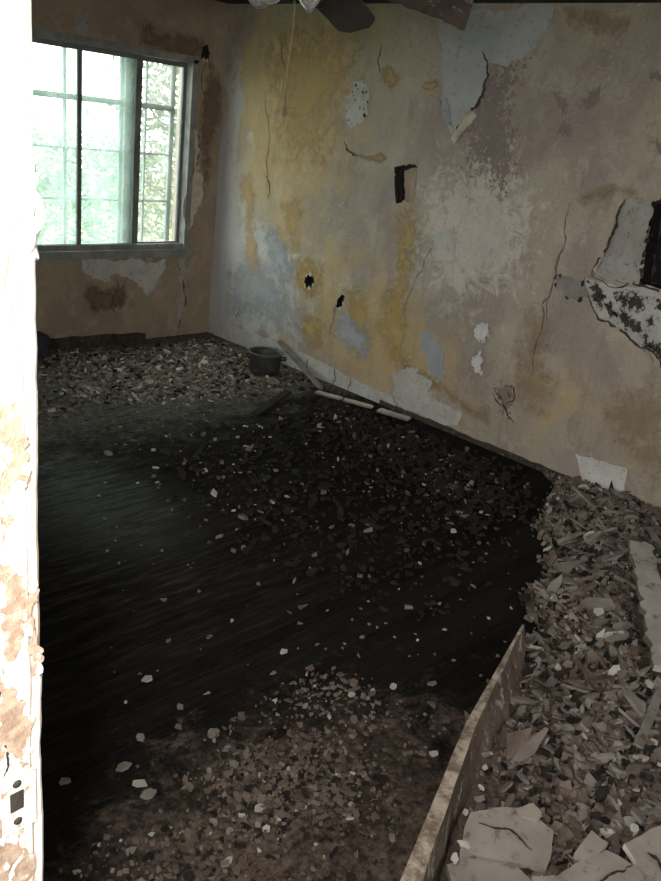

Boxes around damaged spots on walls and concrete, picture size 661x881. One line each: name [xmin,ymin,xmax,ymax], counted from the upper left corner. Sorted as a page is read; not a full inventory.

leakage [201,64,221,181]
peeling [344,79,370,128]
peeling [438,3,554,202]
flaking render [82,258,166,296]
flaking render [210,322,462,426]
spalling [471,322,490,375]
crack [492,203,570,423]
flaking render [554,195,661,368]
flaking render [549,448,628,492]
peeling [0,402,44,776]
peeling [0,806,36,881]